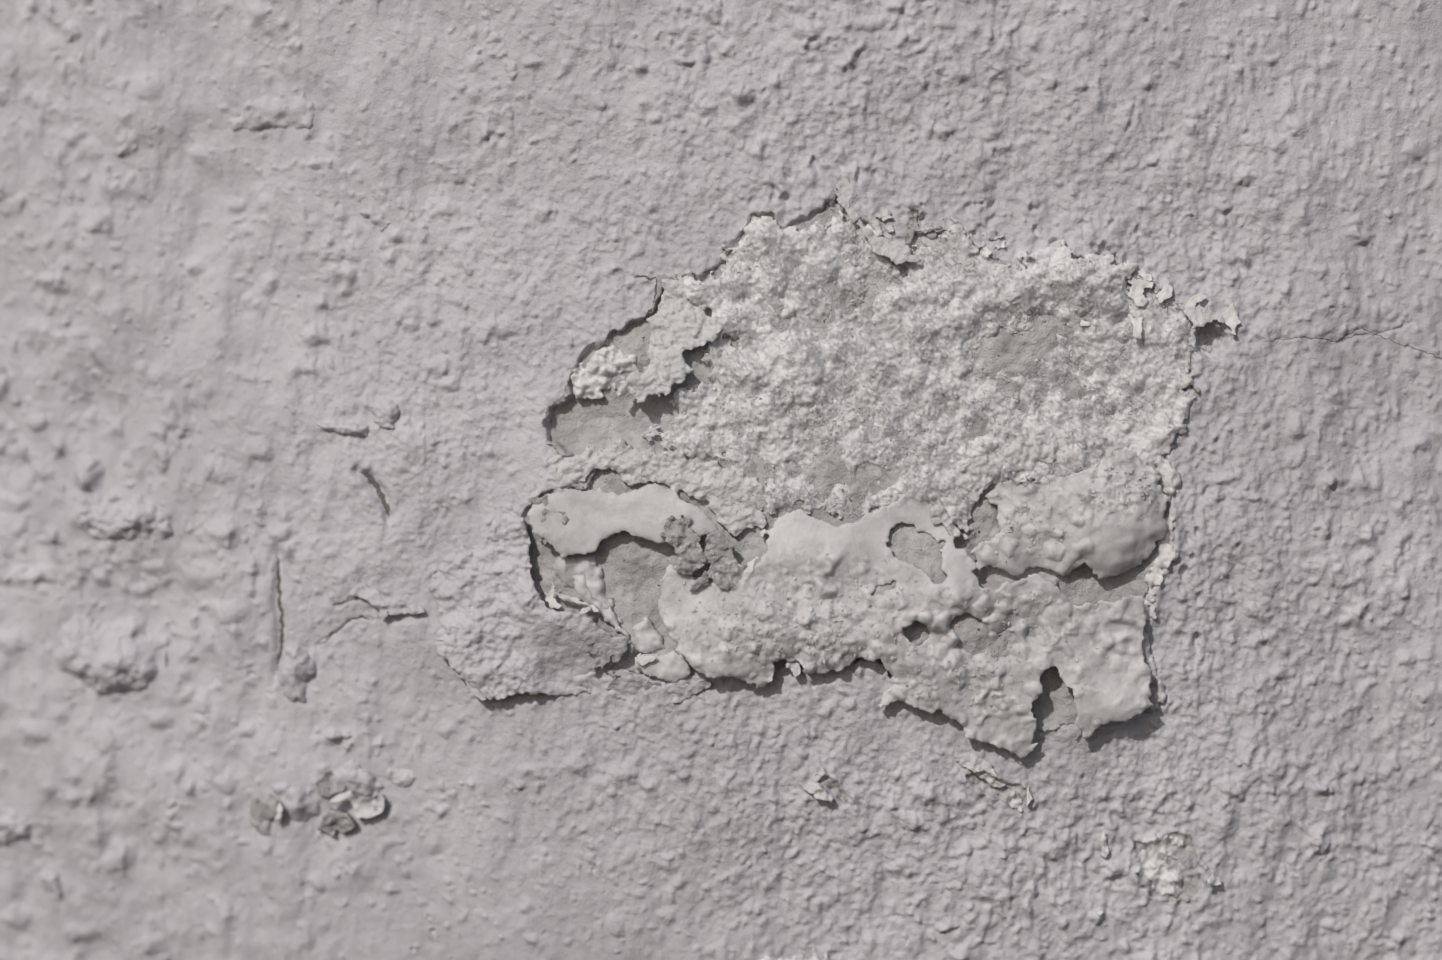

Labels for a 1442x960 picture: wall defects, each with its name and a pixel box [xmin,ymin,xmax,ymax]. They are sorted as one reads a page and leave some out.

spalling [427,178,1241,703]
spalling [1031,666,1077,732]